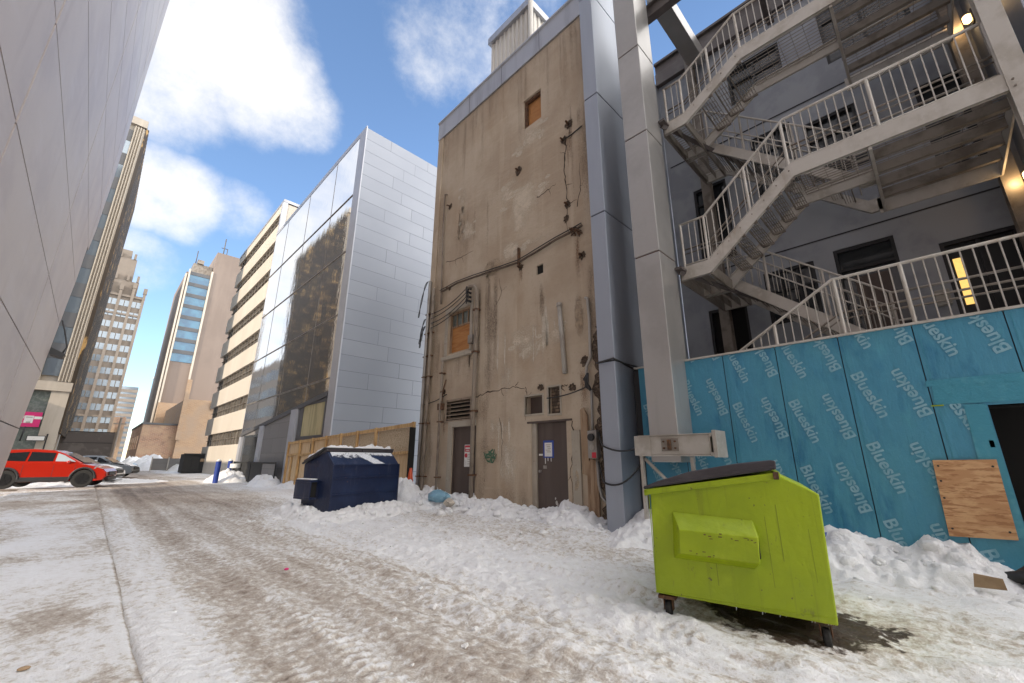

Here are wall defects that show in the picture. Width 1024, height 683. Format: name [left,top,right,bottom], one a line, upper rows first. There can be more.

crack [537,142,582,232]
leakage [431,282,555,506]
crack [476,382,531,463]